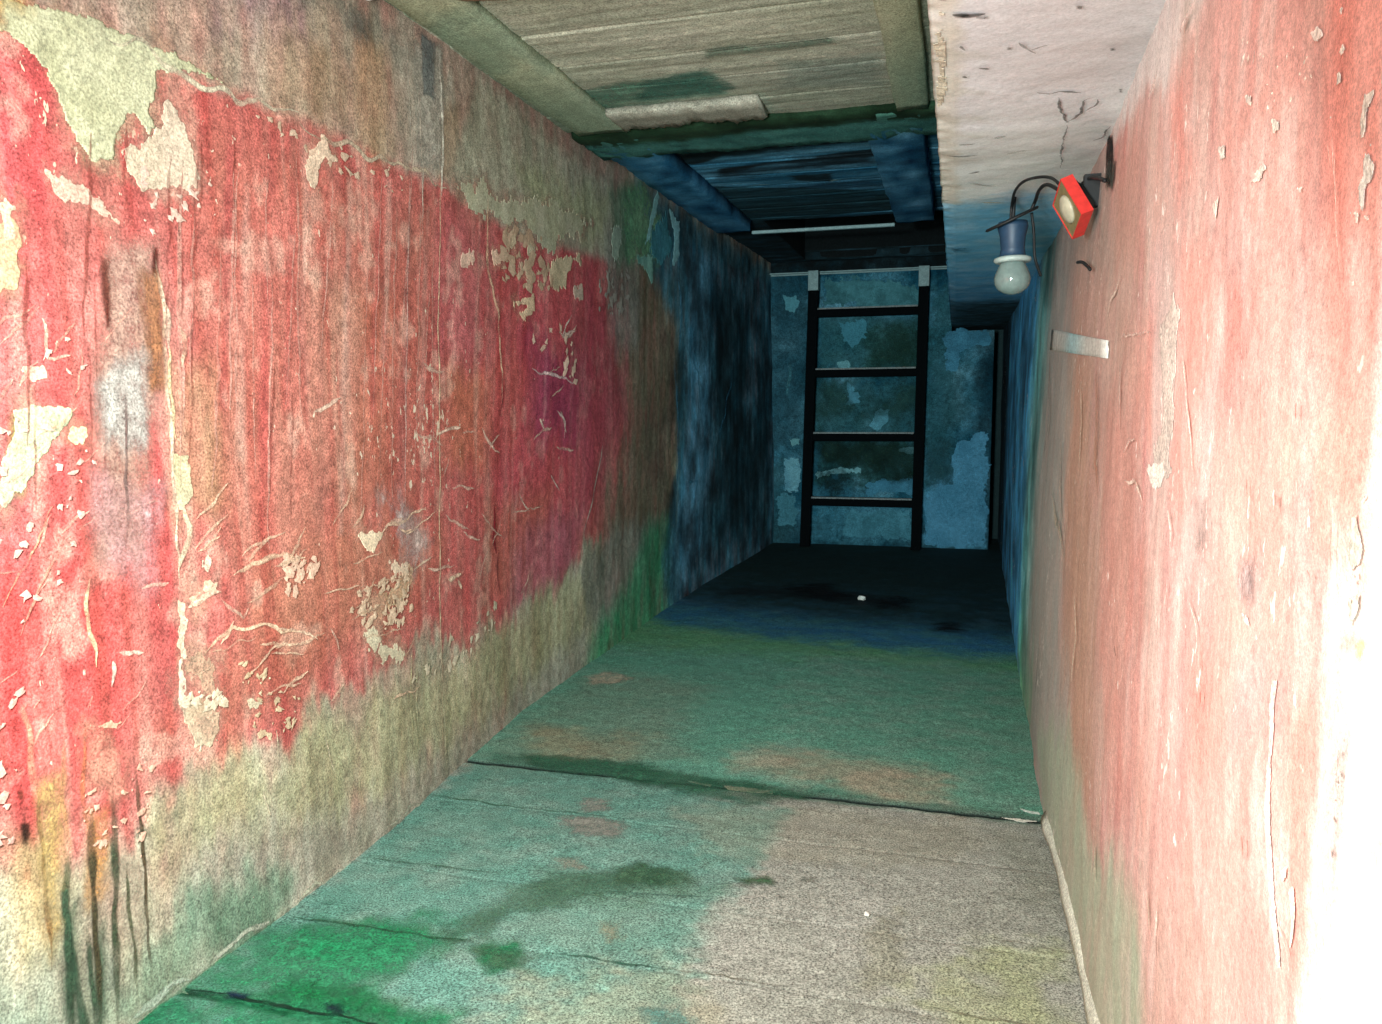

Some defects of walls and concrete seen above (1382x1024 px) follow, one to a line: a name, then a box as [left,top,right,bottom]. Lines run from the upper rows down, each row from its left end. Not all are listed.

water stain [642,73,734,98]
water stain [706,38,832,57]
peeling [0,0,680,385]
peeling [0,403,97,508]
peeling [280,553,320,598]
peeling [349,530,414,665]
peeling [177,554,229,752]
peeling [238,660,300,740]
peeling [82,720,156,858]
water stain [23,718,150,1024]
water stain [618,863,686,885]
water stain [741,877,773,885]